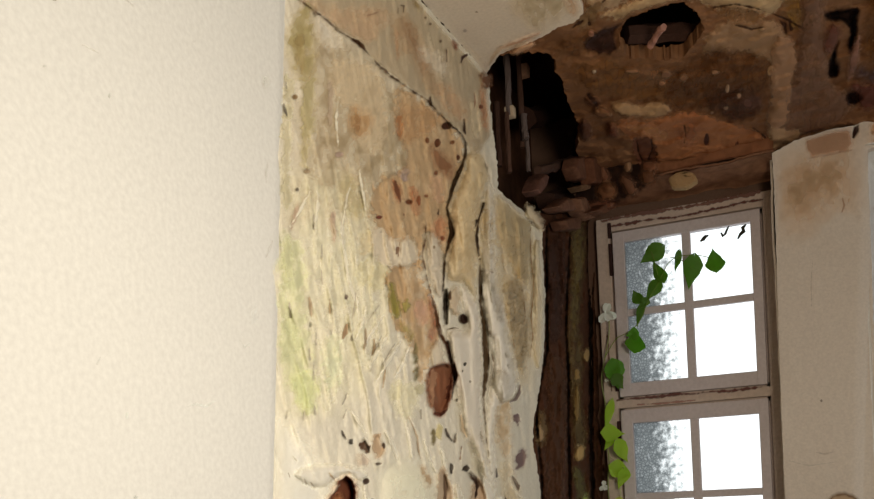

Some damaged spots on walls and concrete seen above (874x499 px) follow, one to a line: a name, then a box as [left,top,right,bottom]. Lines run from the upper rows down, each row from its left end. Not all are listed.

spalling [579,0,667,54]
spalling [612,0,851,165]
spalling [825,8,859,79]
crack [289,249,394,385]
spalling [306,0,541,499]
crack [306,4,612,499]
spalling [521,156,763,232]
peeling [617,386,757,405]